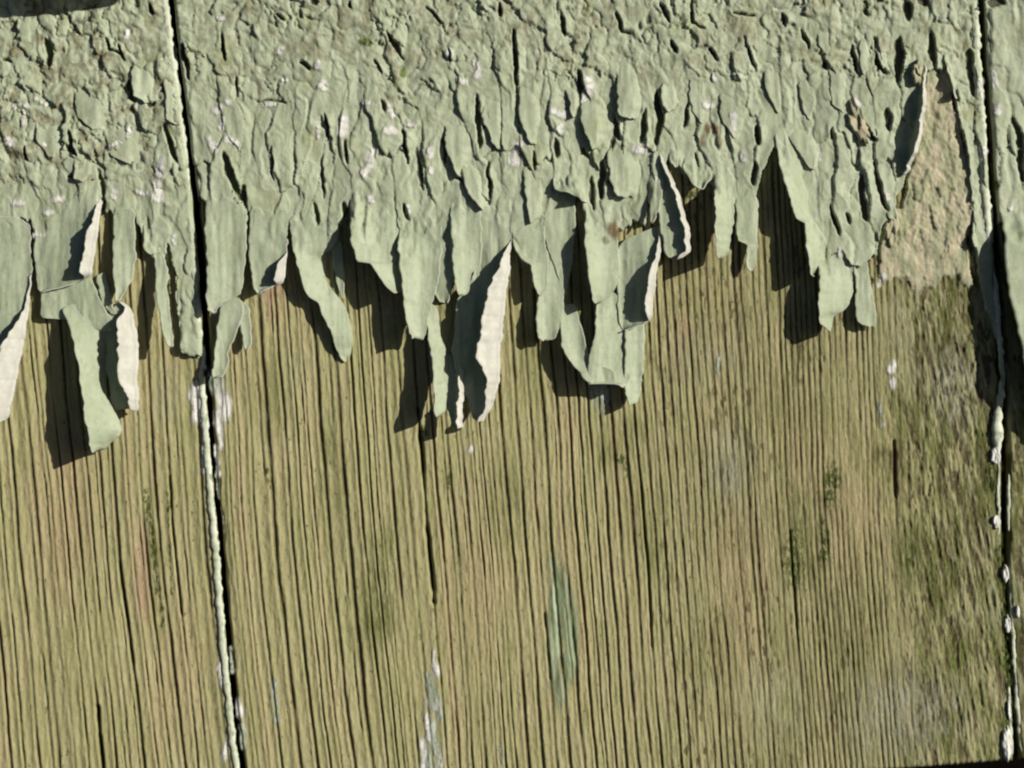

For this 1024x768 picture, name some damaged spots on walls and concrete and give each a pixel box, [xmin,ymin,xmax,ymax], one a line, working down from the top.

peeling [0,0,1024,499]